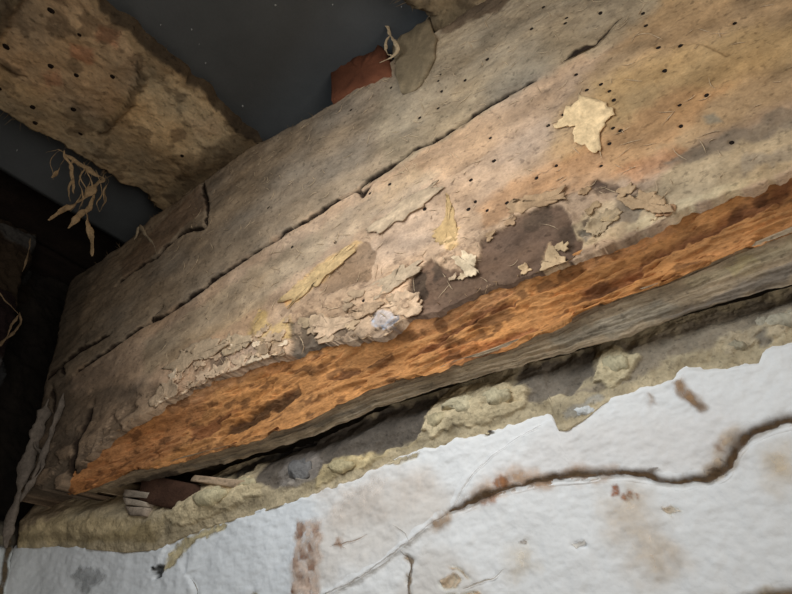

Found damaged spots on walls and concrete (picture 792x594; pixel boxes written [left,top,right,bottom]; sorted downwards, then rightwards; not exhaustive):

peeling [553,95,615,153]
crack [48,82,534,412]
peeling [365,180,480,281]
peeling [504,185,567,226]
peeling [518,241,576,275]
peeling [583,181,676,237]
peeling [148,244,423,409]
crack [68,408,93,477]
crack [432,416,792,523]
crack [325,526,416,594]
crack [766,586,792,594]